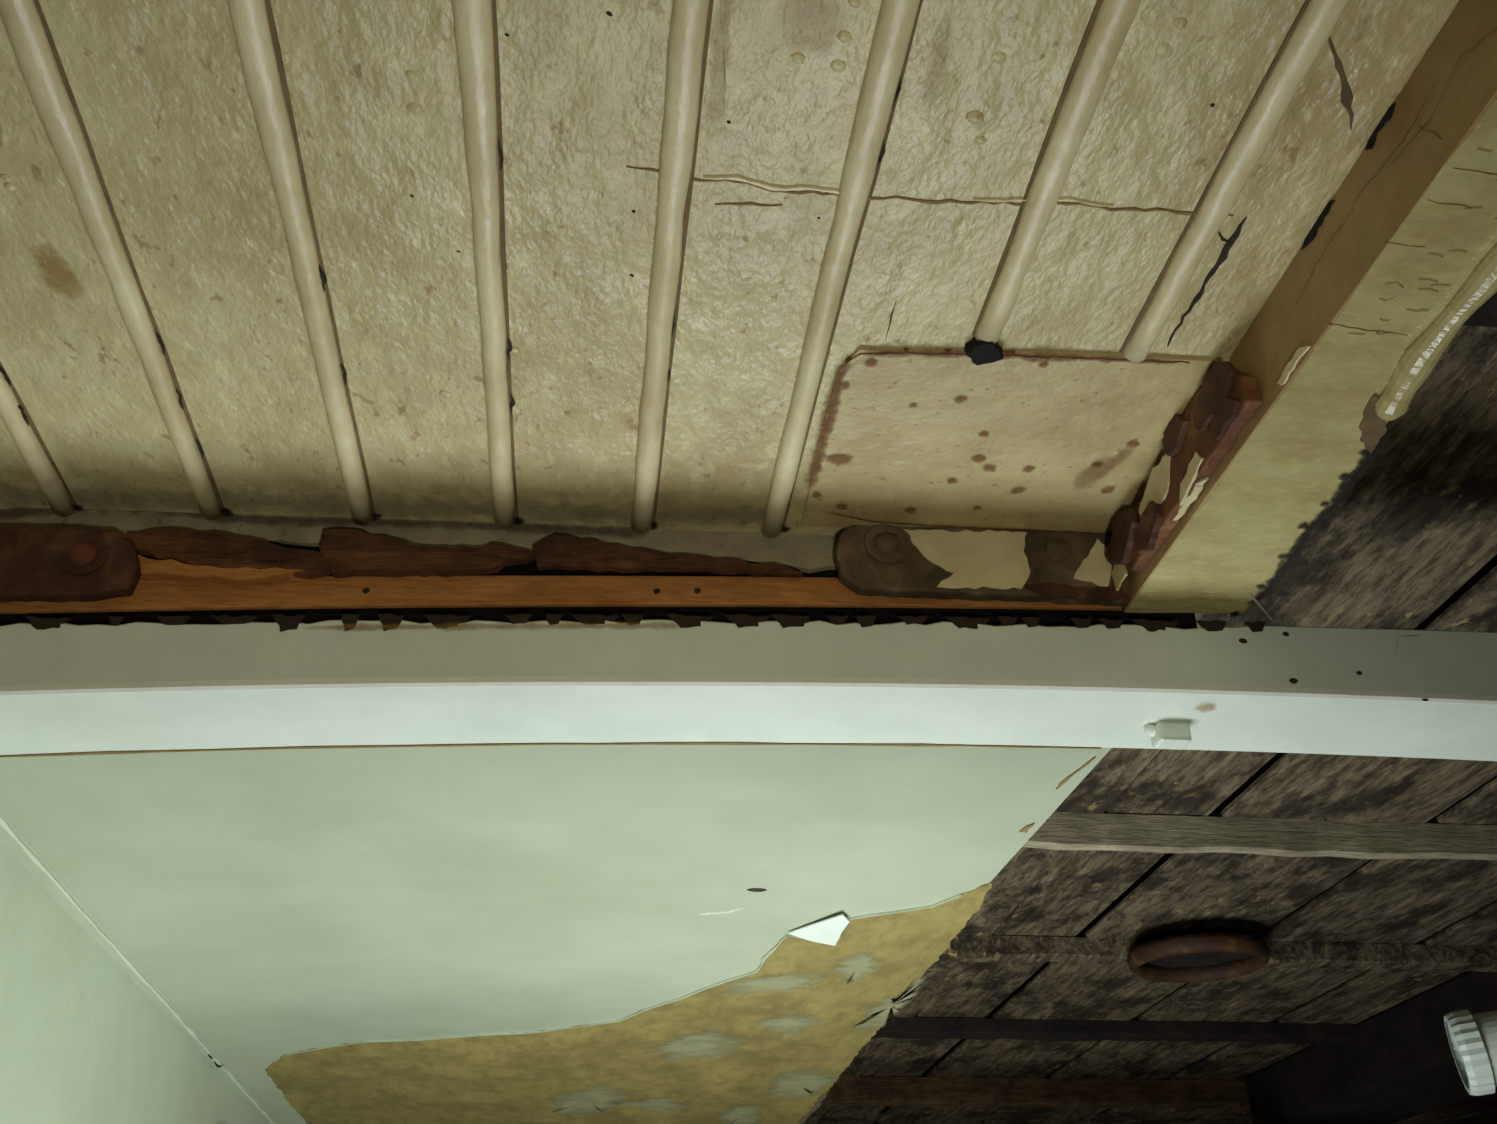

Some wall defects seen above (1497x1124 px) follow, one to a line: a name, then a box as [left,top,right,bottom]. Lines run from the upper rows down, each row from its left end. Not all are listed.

crack [626,166,1247,347]
crack [1329,323,1407,336]
corrosion [1003,350,1190,367]
corrosion [806,348,966,499]
corrosion [972,455,995,472]
corrosion [835,504,1087,533]
peeling [265,882,992,1124]